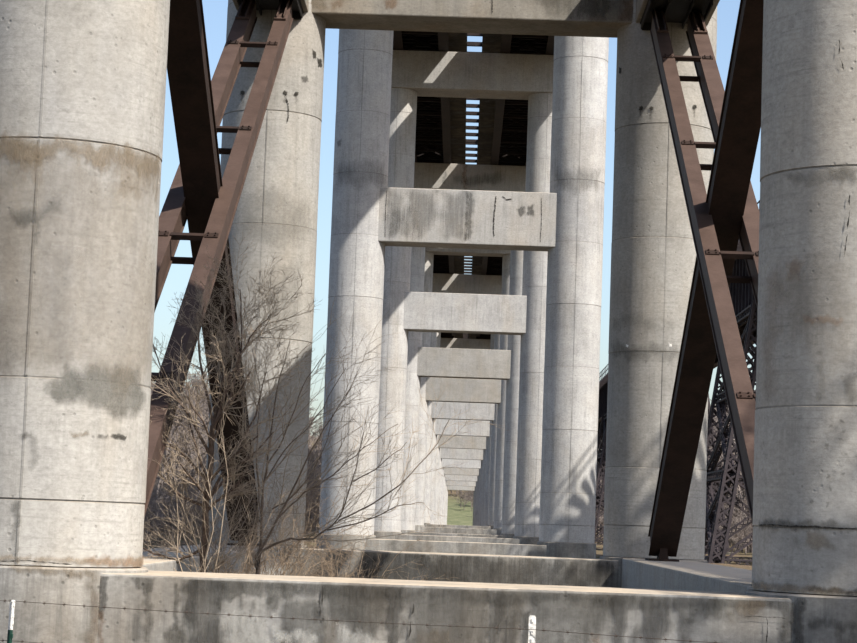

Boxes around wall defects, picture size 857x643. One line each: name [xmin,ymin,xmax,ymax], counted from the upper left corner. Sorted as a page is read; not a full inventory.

leakage [0,137,160,174]
leakage [52,366,144,415]
leakage [174,580,326,643]
leakage [338,553,731,643]
leakage [744,581,839,643]